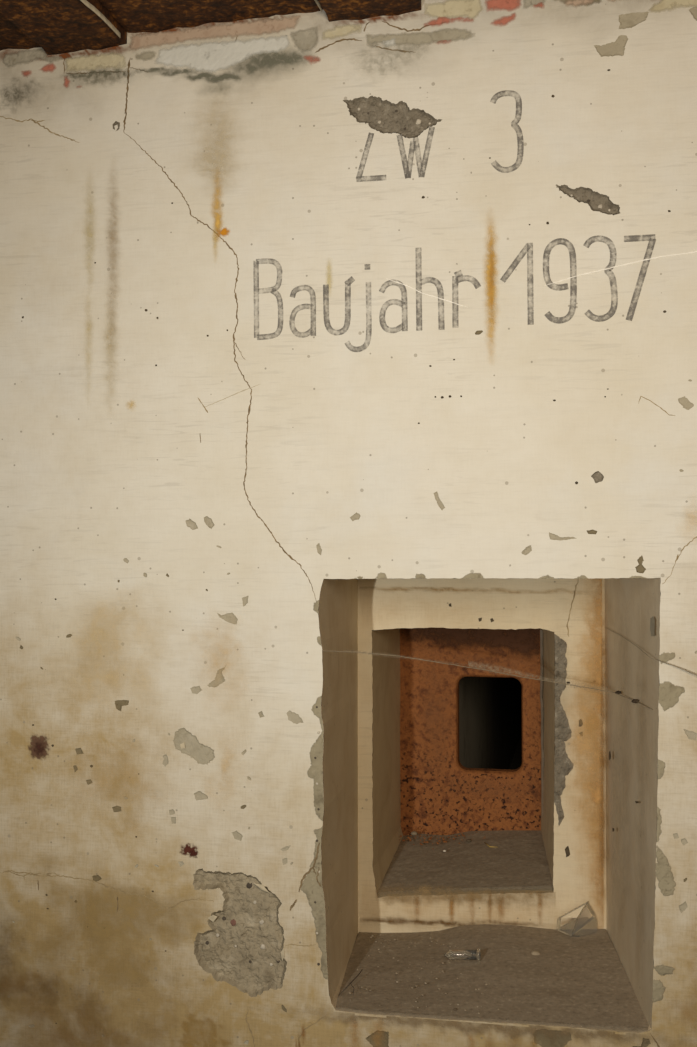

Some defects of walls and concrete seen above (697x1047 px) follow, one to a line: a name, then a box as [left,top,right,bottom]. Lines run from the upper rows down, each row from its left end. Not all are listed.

flaking render [428,17,471,25]
flaking render [487,0,520,25]
peeling [594,12,649,71]
spalling [343,96,442,138]
corrosion [206,134,229,239]
spalling [556,184,620,215]
corrosion [486,231,496,337]
crack [63,59,317,602]
peeling [162,728,215,767]
spalling [193,868,287,997]
leakage [350,1016,622,1039]